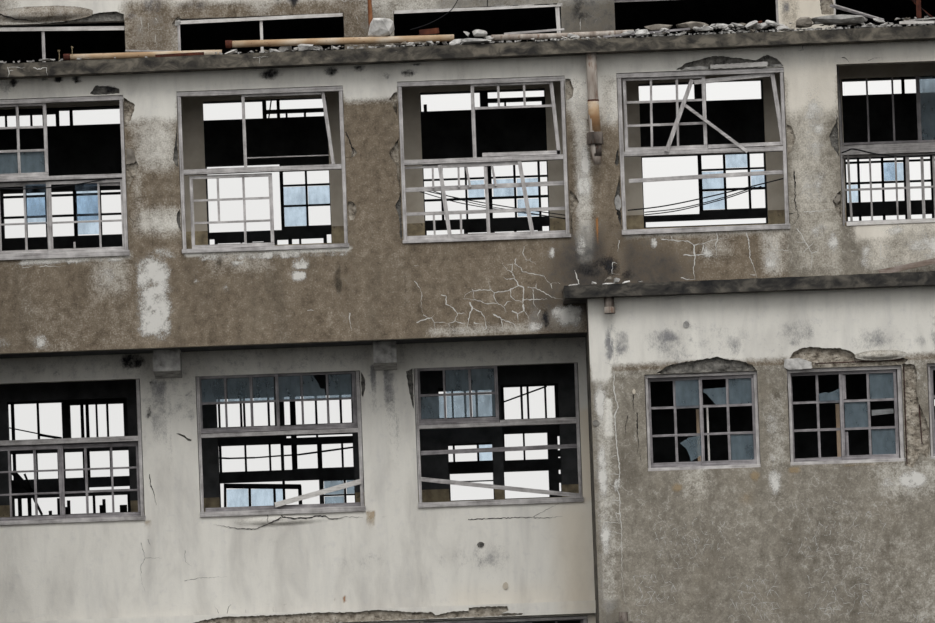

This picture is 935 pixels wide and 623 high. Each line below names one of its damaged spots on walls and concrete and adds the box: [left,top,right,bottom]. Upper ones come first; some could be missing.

spalling [676,55,783,70]
crack [661,171,830,280]
crack [414,249,579,332]
spalling [657,357,756,374]
spalling [784,347,930,468]
crack [214,515,363,530]
spalling [194,606,523,623]